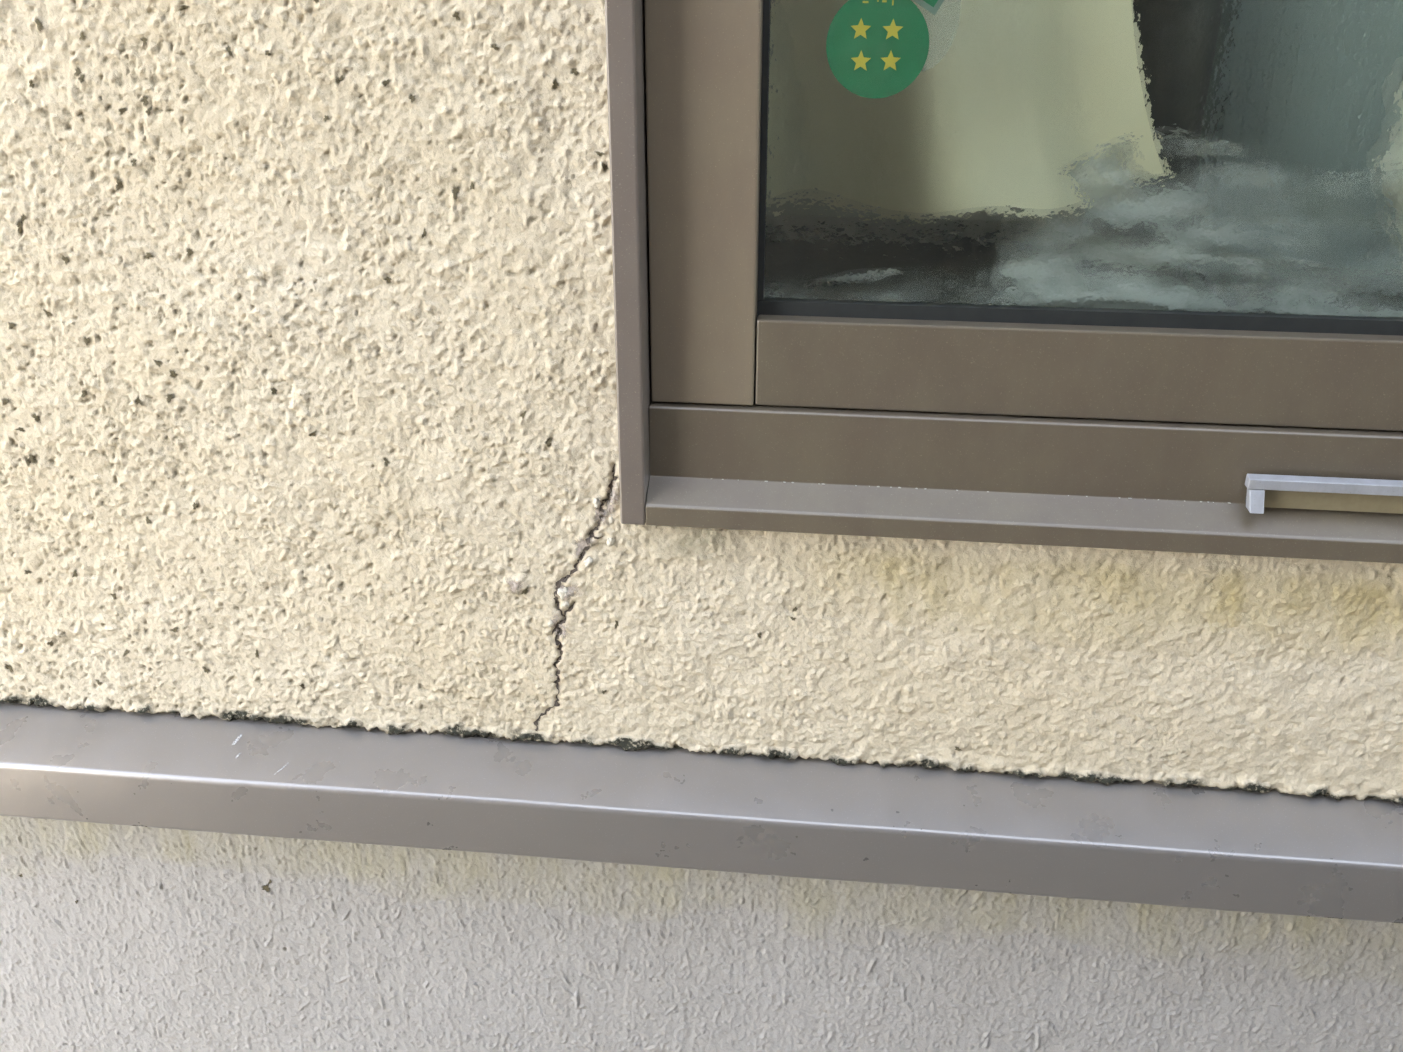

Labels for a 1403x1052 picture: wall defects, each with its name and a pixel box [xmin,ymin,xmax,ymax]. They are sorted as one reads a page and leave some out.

crack [533,464,620,731]